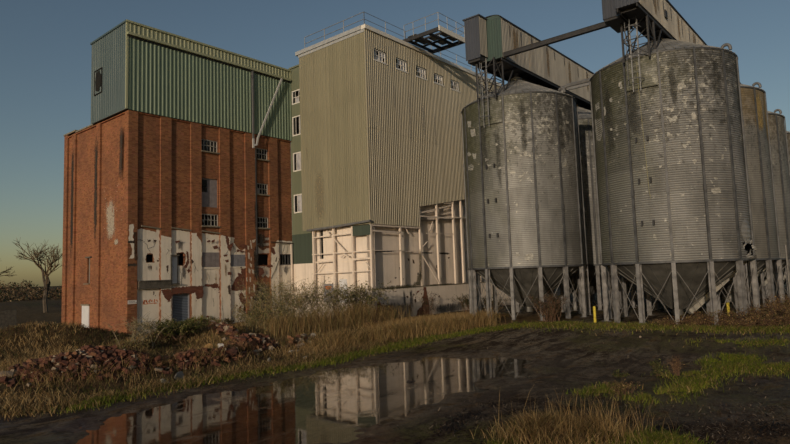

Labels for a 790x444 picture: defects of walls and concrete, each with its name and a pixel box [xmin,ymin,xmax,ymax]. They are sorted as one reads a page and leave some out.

peeling [153,235,277,313]